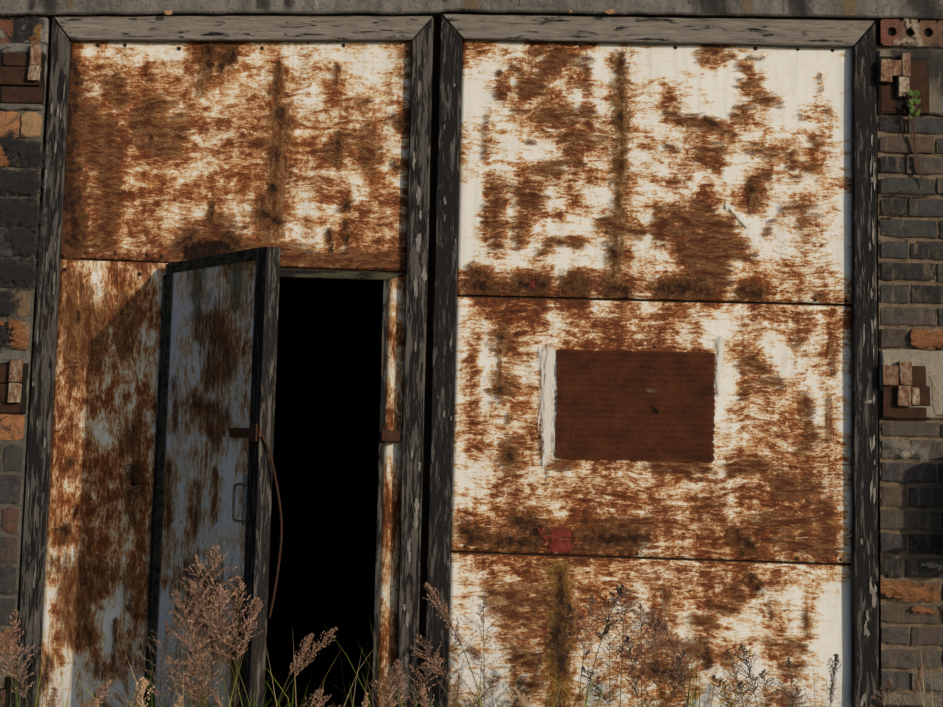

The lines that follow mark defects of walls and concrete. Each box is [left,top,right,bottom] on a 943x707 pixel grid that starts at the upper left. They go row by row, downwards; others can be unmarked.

corrosion [59,54,191,385]
corrosion [196,44,240,98]
corrosion [245,59,408,268]
corrosion [461,45,825,301]
corrosion [47,520,142,707]
corrosion [170,291,244,707]
corrosion [454,505,553,552]
corrosion [485,322,524,474]
corrosion [479,559,577,707]
corrosion [540,347,845,559]
corrosion [643,569,776,689]
corrosion [764,611,812,671]